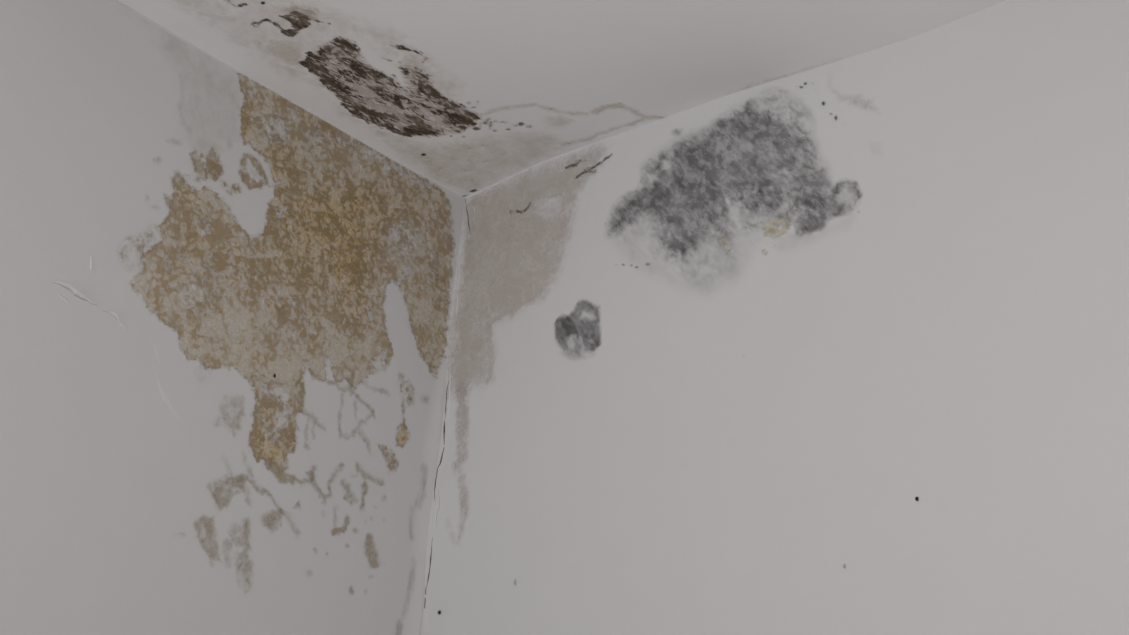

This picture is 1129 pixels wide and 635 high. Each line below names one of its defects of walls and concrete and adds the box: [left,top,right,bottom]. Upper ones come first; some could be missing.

leakage [251,9,524,137]
leakage [613,108,860,254]
leakage [131,74,600,483]